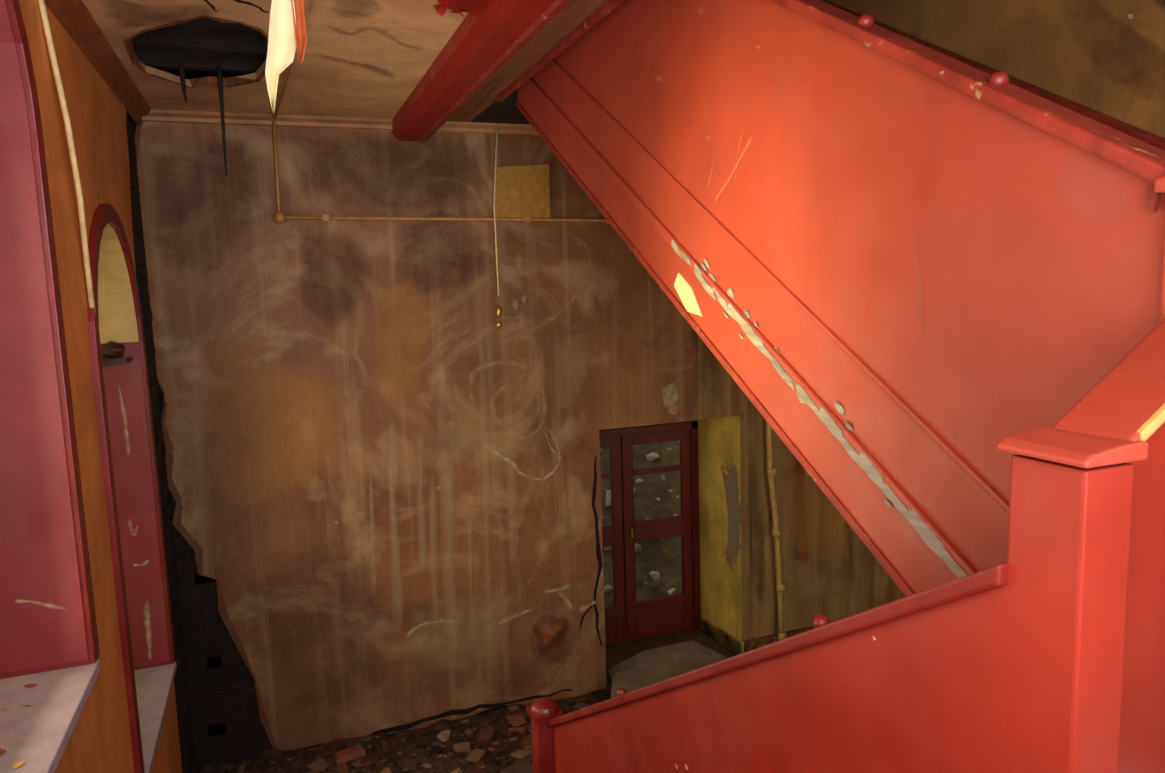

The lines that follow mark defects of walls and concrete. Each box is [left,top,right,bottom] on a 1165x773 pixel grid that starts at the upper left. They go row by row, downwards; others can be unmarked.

crack [204,0,269,13]
peeling [434,0,478,17]
peeling [265,0,307,113]
flaking render [138,266,162,321]
peeling [671,240,967,578]